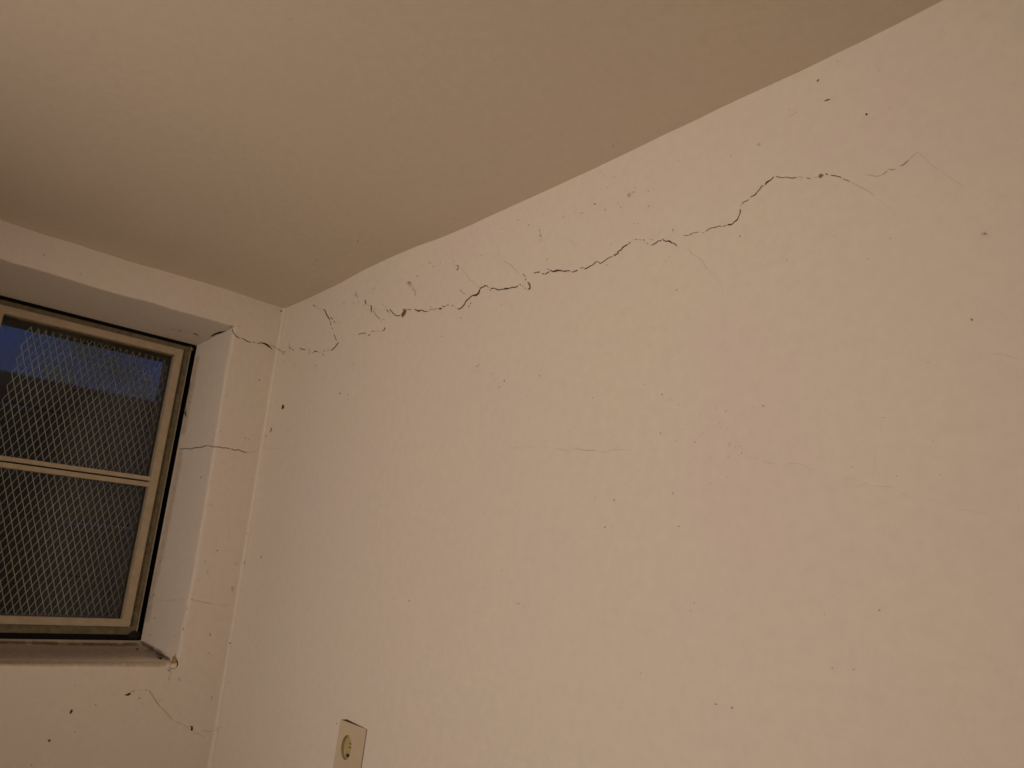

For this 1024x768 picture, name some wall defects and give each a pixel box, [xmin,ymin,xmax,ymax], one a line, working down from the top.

crack [196,173,848,355]